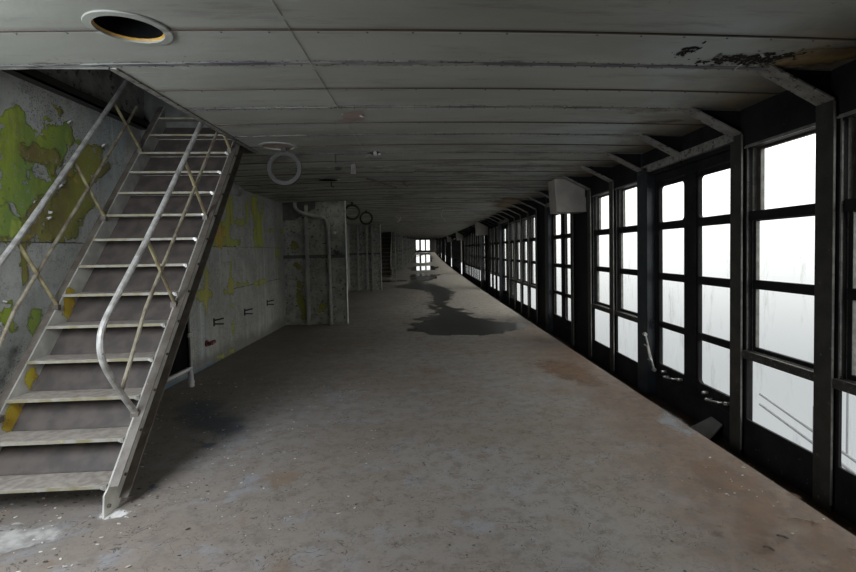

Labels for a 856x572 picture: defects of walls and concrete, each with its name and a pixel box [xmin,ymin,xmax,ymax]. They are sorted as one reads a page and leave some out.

peeling [672,41,813,69]
peeling [0,104,111,286]
peeling [213,195,284,250]
peeling [0,299,43,337]
peeling [62,287,75,319]
damp [397,274,532,336]
peeling [24,367,38,390]
peeling [2,403,23,432]